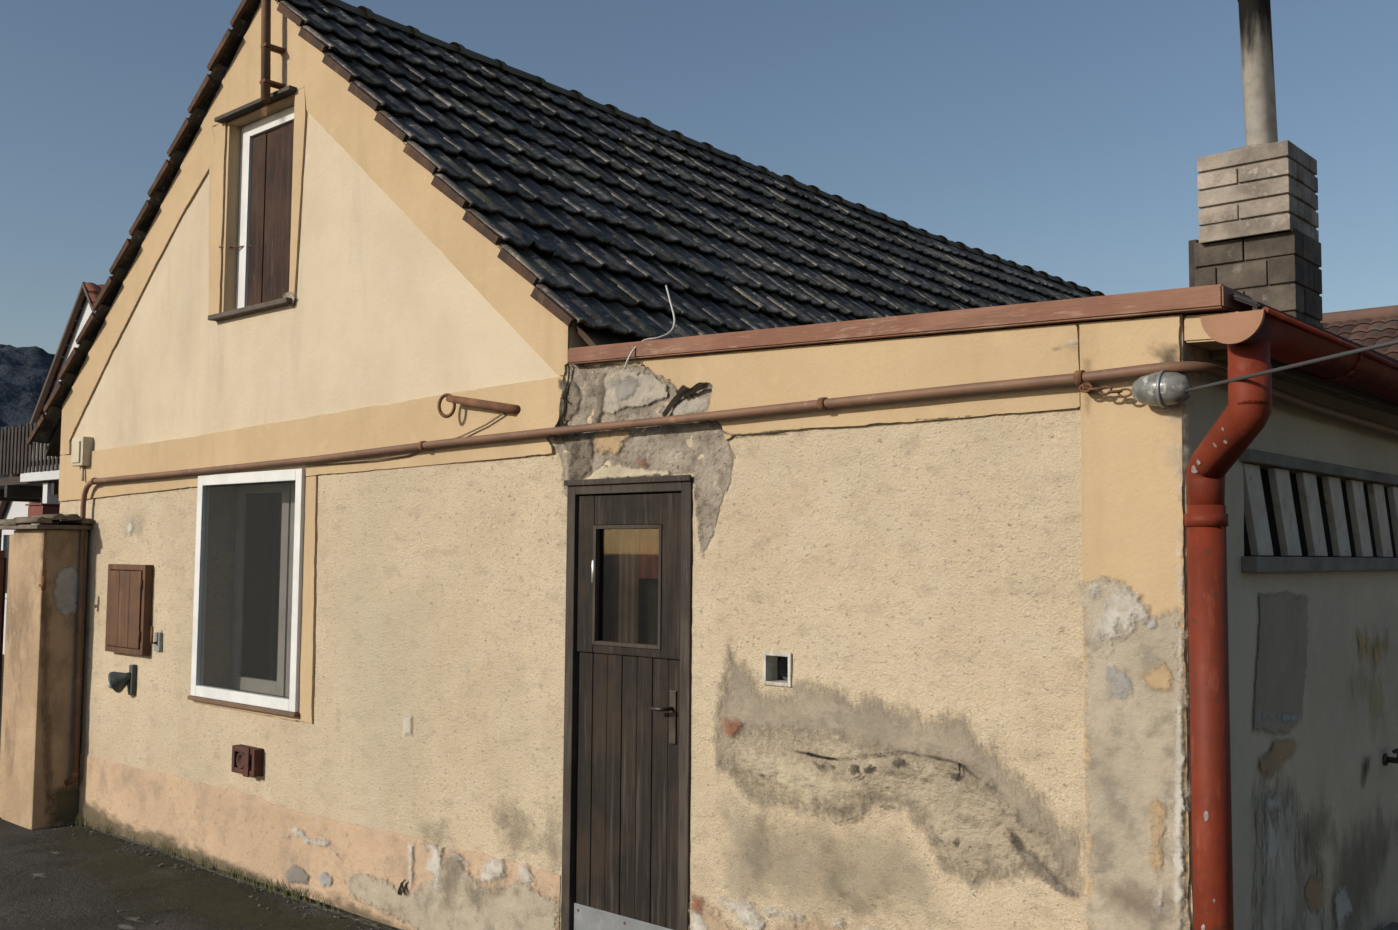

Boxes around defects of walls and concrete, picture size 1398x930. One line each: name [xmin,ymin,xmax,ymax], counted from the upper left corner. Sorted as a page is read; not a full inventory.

flaking render [553,362,735,555]
peeling [53,567,79,623]
flaking render [715,528,1205,930]
flaking render [285,865,331,886]
flaking render [349,844,560,930]
peeling [689,896,841,930]